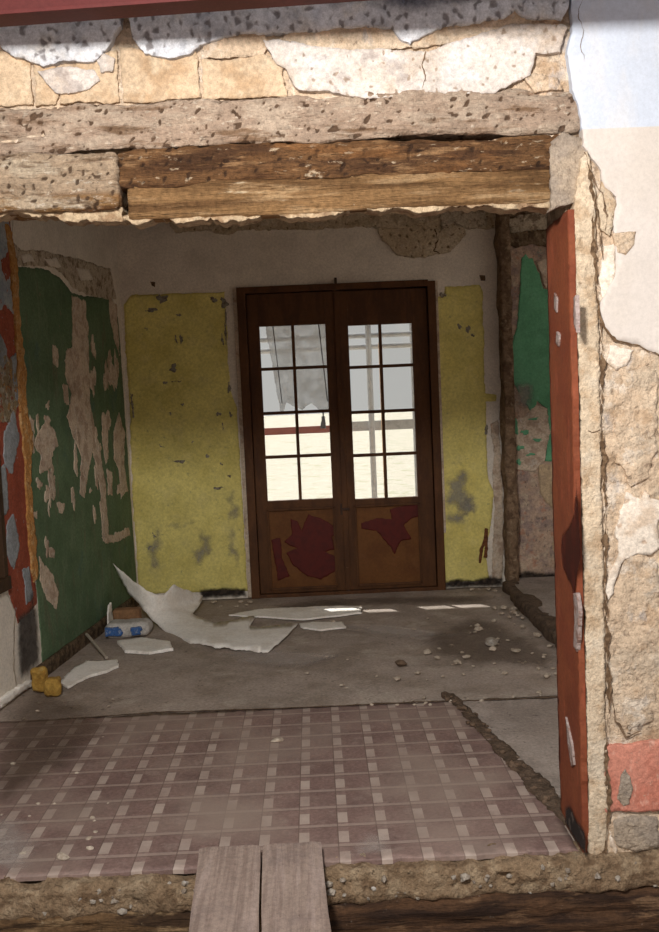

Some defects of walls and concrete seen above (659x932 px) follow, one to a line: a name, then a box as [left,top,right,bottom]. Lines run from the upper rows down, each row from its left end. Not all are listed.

spalling [0,7,570,110]
peeling [277,202,550,258]
peeling [536,258,558,312]
peeling [0,204,264,609]
peeling [515,386,551,472]
spalling [589,157,659,745]
peeling [447,472,474,522]
flaking render [479,420,504,579]
peeling [573,593,583,652]
peeling [565,717,576,766]
spalling [607,811,659,854]